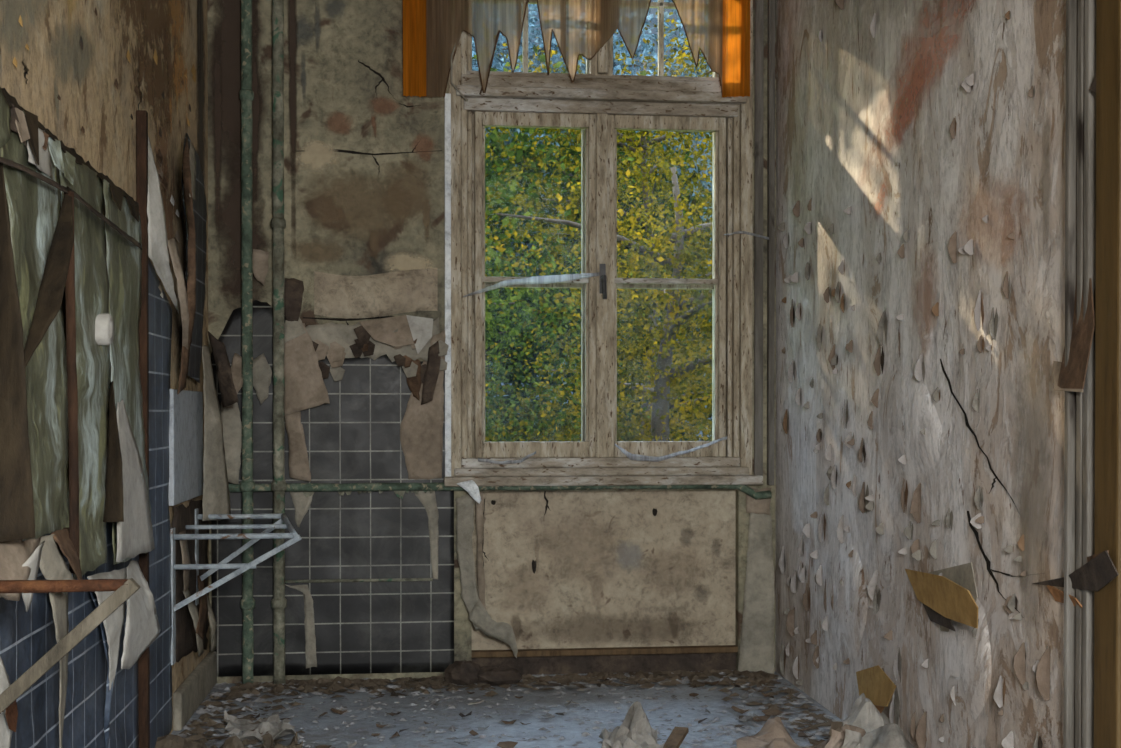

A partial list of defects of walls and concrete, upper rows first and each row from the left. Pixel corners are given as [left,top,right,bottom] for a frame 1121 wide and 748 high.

flaking render [1,88,139,222]
damp [117,0,266,302]
damp [288,0,345,176]
corrosion [886,0,973,144]
flaking render [305,315,449,383]
peeling [959,271,1011,355]
peeling [1053,273,1095,392]
peeling [778,310,904,686]
peeling [897,479,979,639]
peeling [1003,534,1119,608]
peeling [833,630,945,748]
peeling [993,642,1050,716]